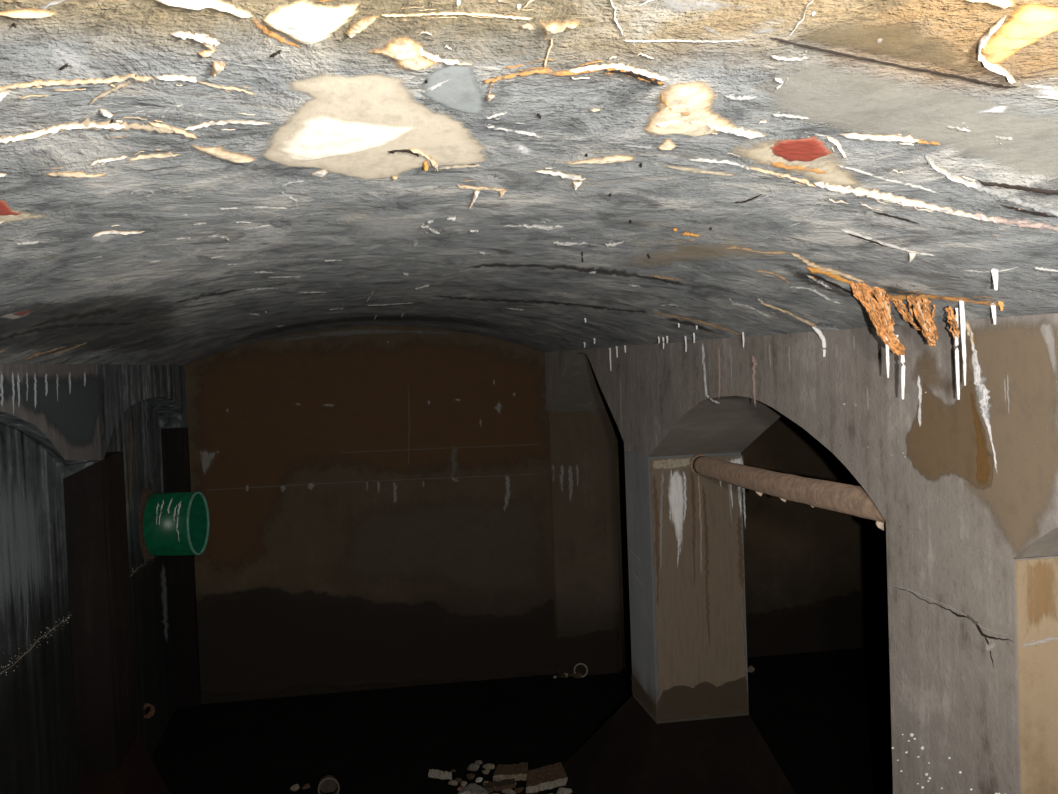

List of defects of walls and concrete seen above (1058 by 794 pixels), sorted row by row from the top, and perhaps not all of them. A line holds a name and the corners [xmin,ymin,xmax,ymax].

spalling [253,0,376,48]
crack [484,0,742,101]
peeling [771,0,1058,88]
peeling [262,32,486,179]
spalling [645,82,766,139]
rust [726,246,864,295]
rust [871,287,999,306]
water stain [0,342,103,446]
water stain [891,301,1058,553]
water stain [0,475,71,675]
water stain [196,458,863,721]
crack [892,585,1014,667]